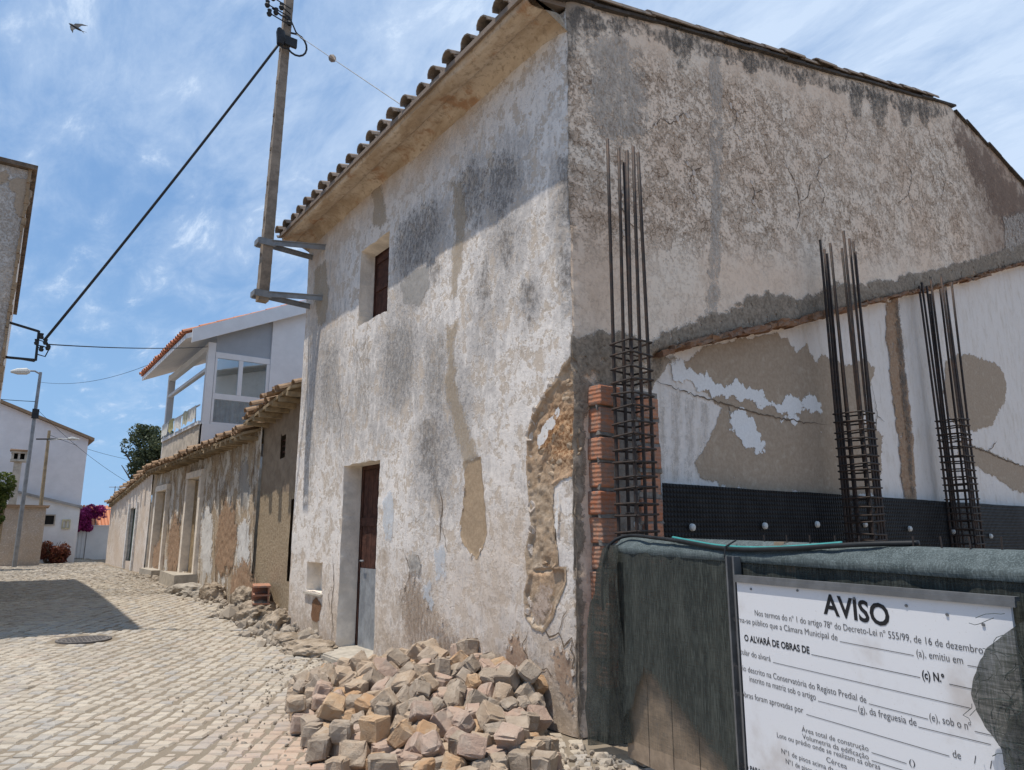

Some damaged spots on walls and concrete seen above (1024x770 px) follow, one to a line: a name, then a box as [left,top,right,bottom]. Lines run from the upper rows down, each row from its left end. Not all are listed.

water stain [566,6,1024,244]
water stain [450,181,466,299]
crack [657,381,827,425]
peeling [669,333,883,495]
peeling [942,353,1007,432]
flaking render [214,499,257,595]
flaking render [459,457,487,560]
flaking render [523,355,582,633]